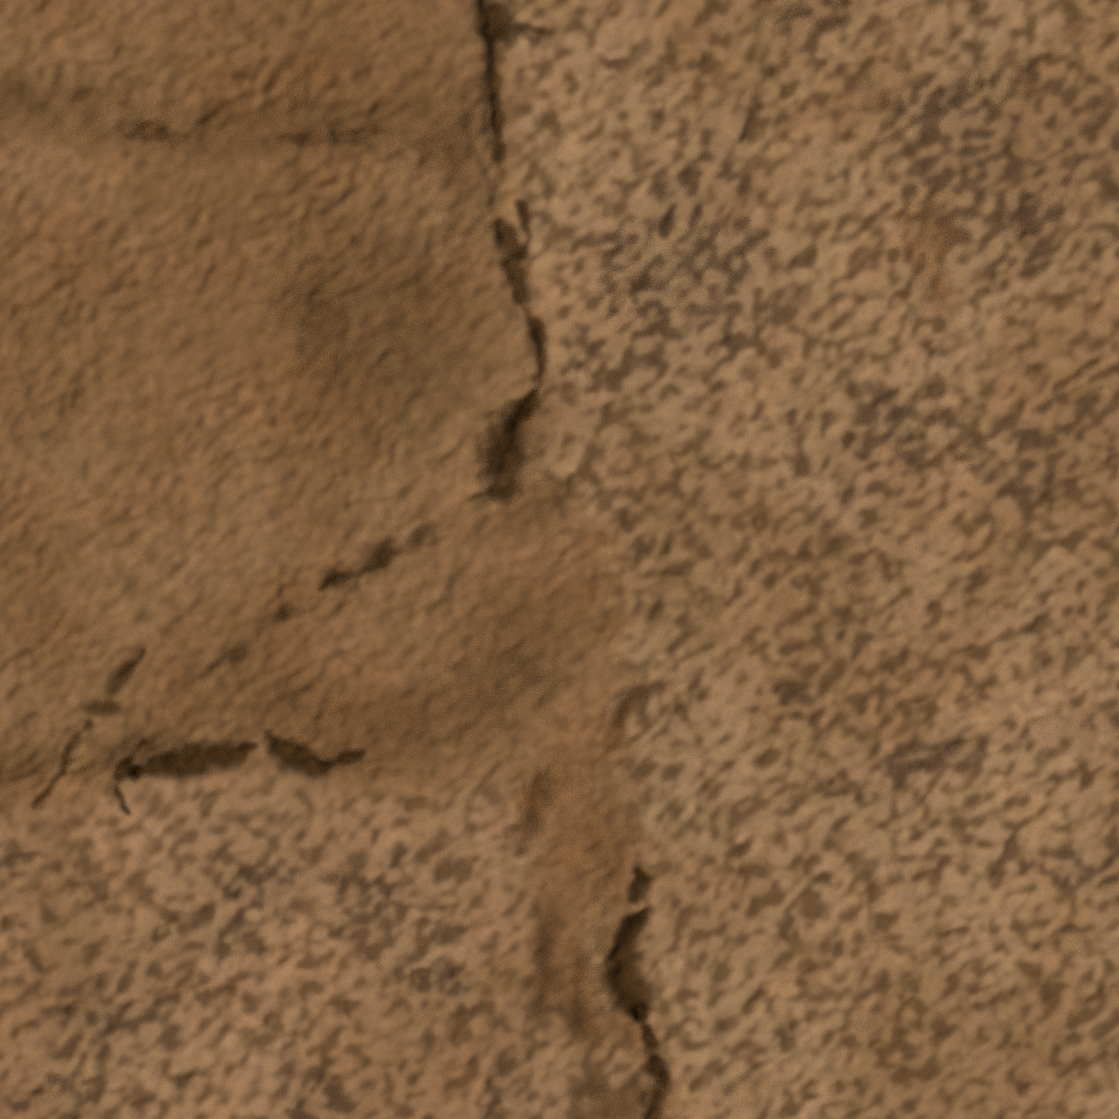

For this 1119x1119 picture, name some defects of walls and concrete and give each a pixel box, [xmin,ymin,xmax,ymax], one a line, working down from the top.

crack [477,0,544,162]
crack [498,201,546,417]
crack [277,607,291,619]
crack [318,526,430,590]
crack [114,733,365,815]
crack [607,868,668,1119]